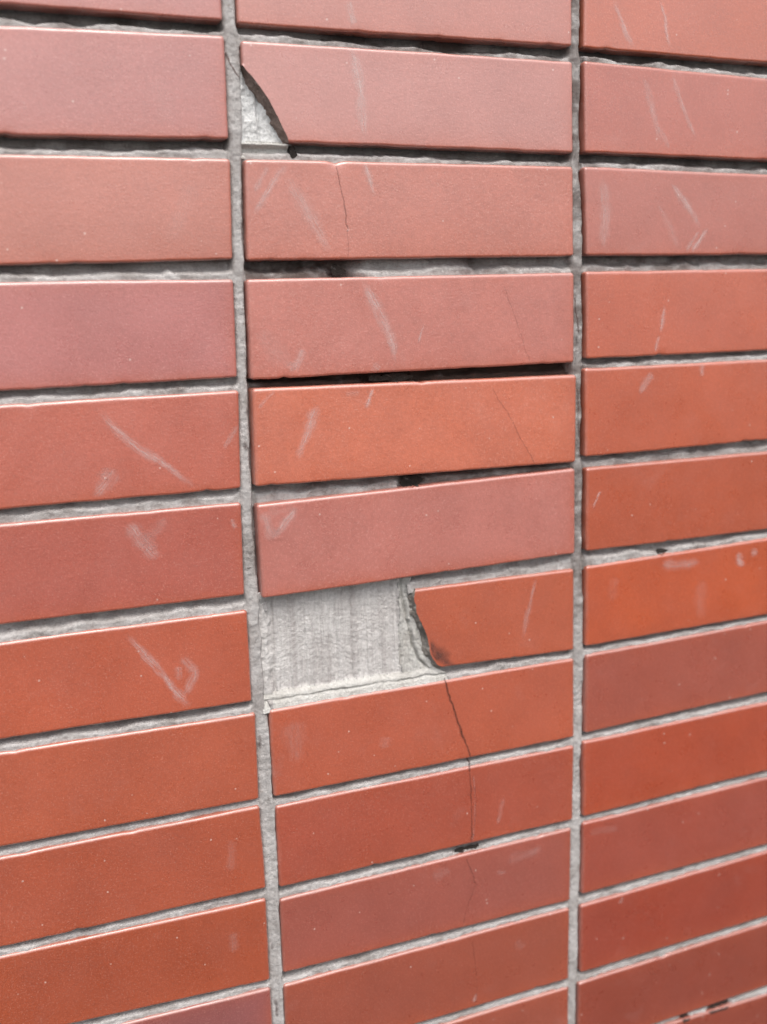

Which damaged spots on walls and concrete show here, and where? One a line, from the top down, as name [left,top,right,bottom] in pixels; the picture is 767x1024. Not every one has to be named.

spalling [240,65,291,159]
spalling [258,577,448,714]
crack [444,678,470,771]